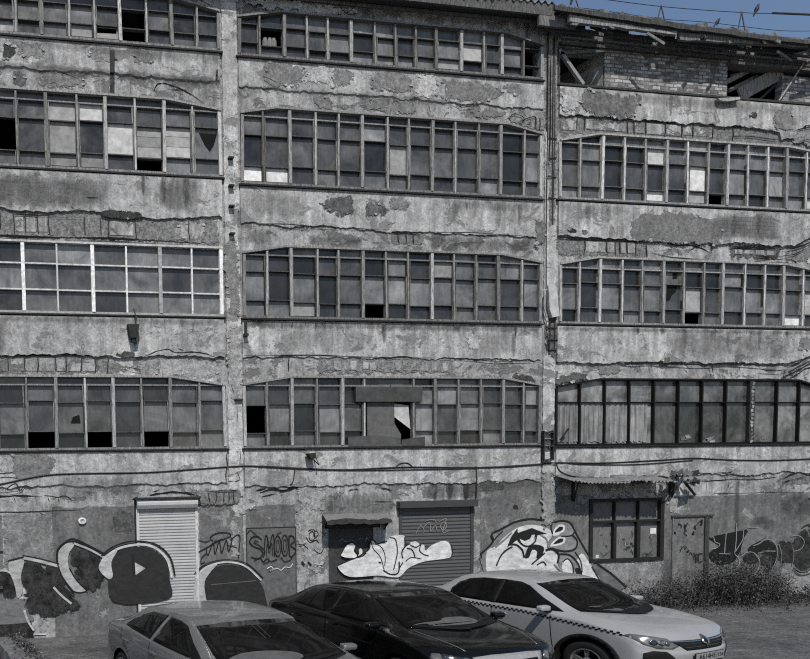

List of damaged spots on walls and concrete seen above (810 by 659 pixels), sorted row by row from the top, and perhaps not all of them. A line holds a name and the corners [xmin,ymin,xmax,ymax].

peeling [2,40,45,59]
flaking render [13,70,27,87]
flaking render [39,70,86,89]
flaking render [301,64,354,88]
flaking render [370,69,440,99]
spalling [471,32,810,247]
flaking render [319,195,354,218]
flaking render [365,196,411,216]
crack [655,242,710,260]
crack [619,361,810,379]
peeling [478,480,504,492]
spalling [777,472,810,486]